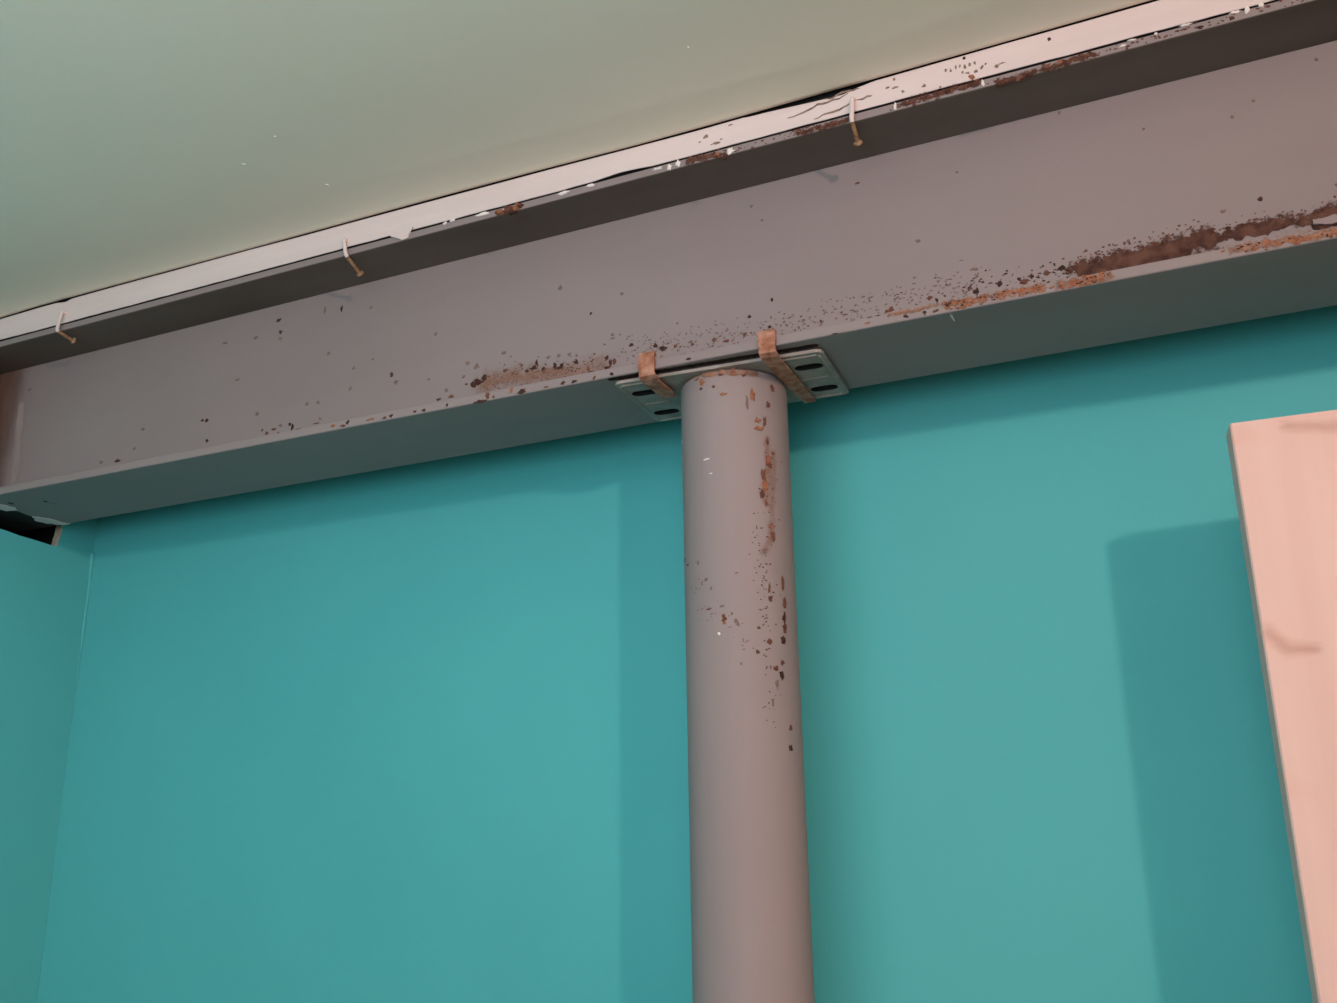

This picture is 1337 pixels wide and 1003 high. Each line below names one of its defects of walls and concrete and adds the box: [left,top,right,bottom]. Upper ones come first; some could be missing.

crack [748,79,875,119]
corrosion [255,400,350,435]
corrosion [462,183,1337,751]